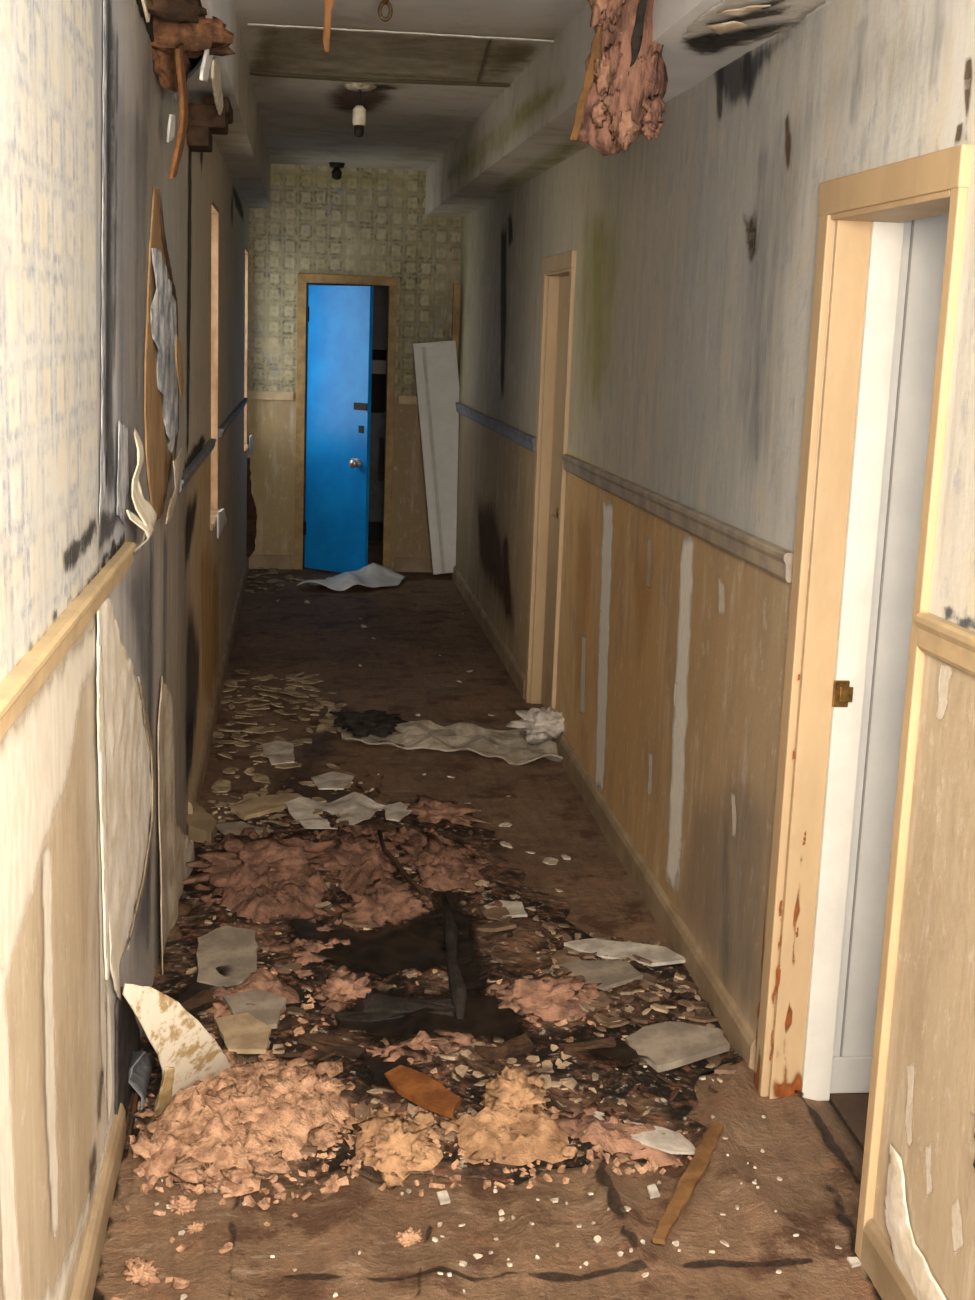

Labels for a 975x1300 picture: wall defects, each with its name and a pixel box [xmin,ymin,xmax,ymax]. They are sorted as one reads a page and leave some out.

peeling [682,0,825,46]
spalling [136,0,236,179]
damp [106,0,118,491]
peeling [175,335,184,402]
damp [65,510,125,598]
peeling [126,510,154,555]
damp [945,607,975,628]
peeling [937,665,952,719]
peeling [0,597,155,1300]
peeling [885,1066,946,1300]
peeling [952,1199,963,1251]